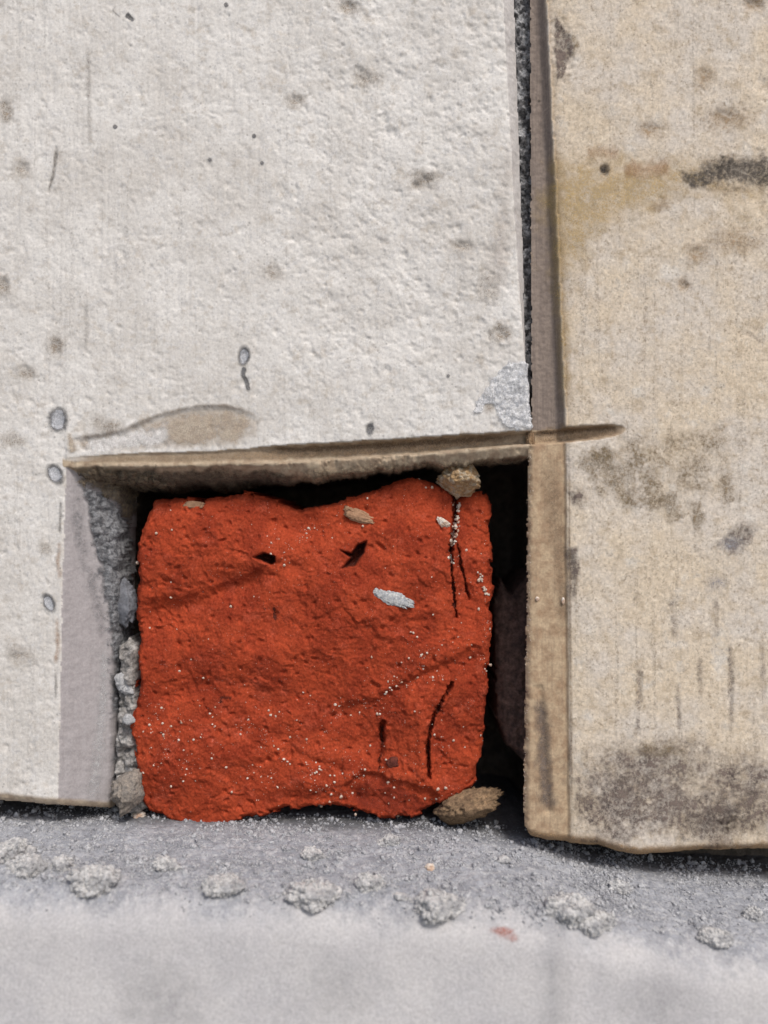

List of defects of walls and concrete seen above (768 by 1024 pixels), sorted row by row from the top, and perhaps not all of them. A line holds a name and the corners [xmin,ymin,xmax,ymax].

damp [545,156,768,257]
damp [582,442,675,515]
peeling [183,501,205,509]
damp [724,526,750,553]
spalling [345,543,365,567]
crack [450,504,468,615]
peeling [373,588,415,609]
crack [426,690,450,774]
spalling [386,756,399,768]